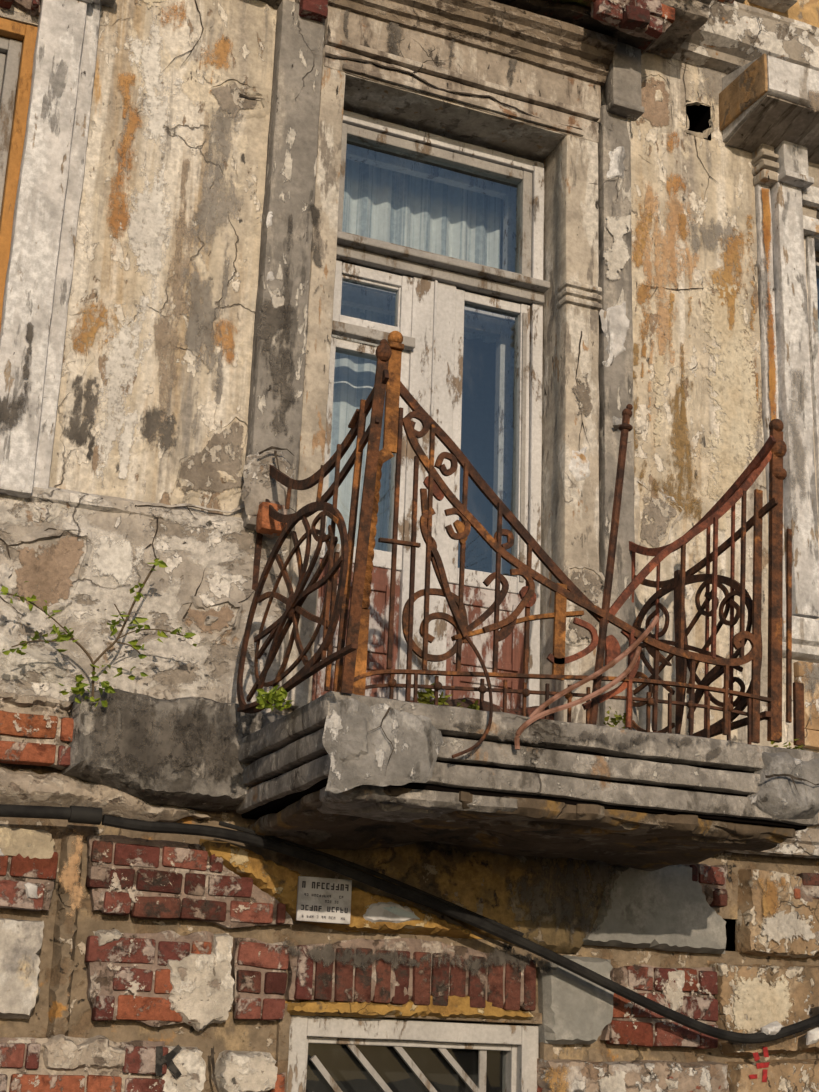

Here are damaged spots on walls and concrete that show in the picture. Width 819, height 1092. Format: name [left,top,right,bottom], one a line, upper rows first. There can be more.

crack [159,0,206,75]
flaking render [639,72,715,141]
leakage [63,0,243,479]
leakage [0,322,34,430]
leakage [634,219,763,519]
crack [0,526,57,559]
flaking render [164,412,294,539]
leakage [718,490,748,531]
spalling [0,689,210,822]
flaking render [0,849,59,911]
flaking render [85,835,293,1032]
flaking render [0,1034,169,1092]